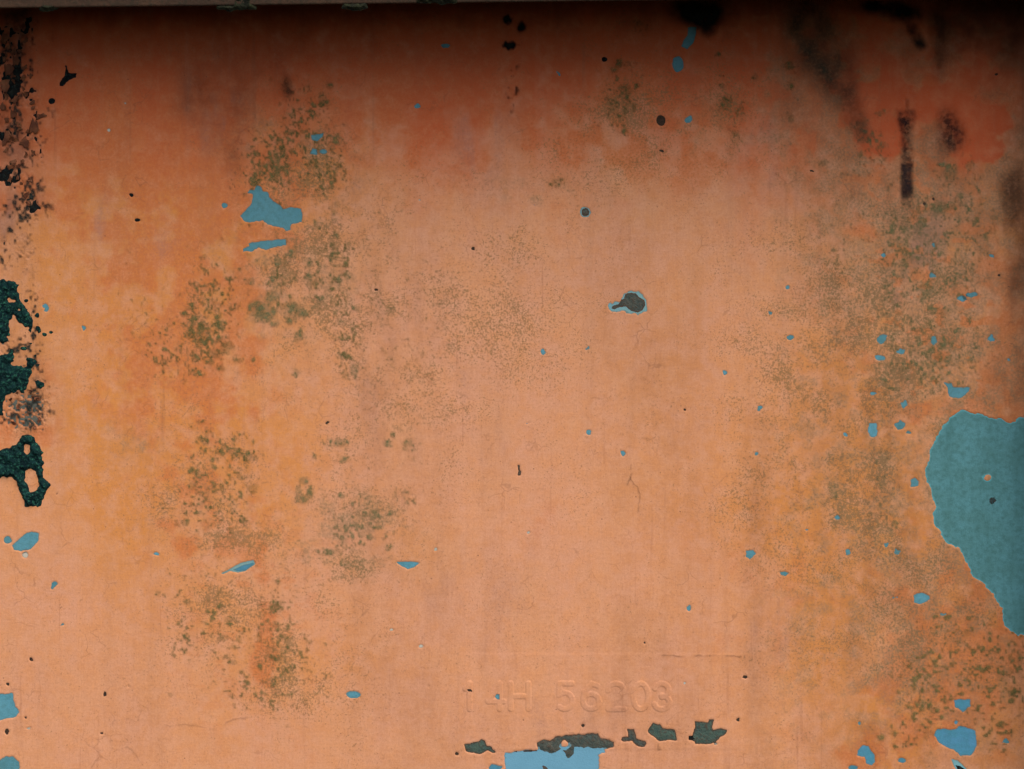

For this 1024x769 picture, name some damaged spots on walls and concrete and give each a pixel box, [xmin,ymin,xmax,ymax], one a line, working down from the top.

corrosion [899,113,912,197]
peeling [240,185,303,252]
peeling [608,291,647,315]
peeling [1,290,53,430]
peeling [910,382,1024,636]
peeling [455,719,727,769]
peeling [934,699,977,769]